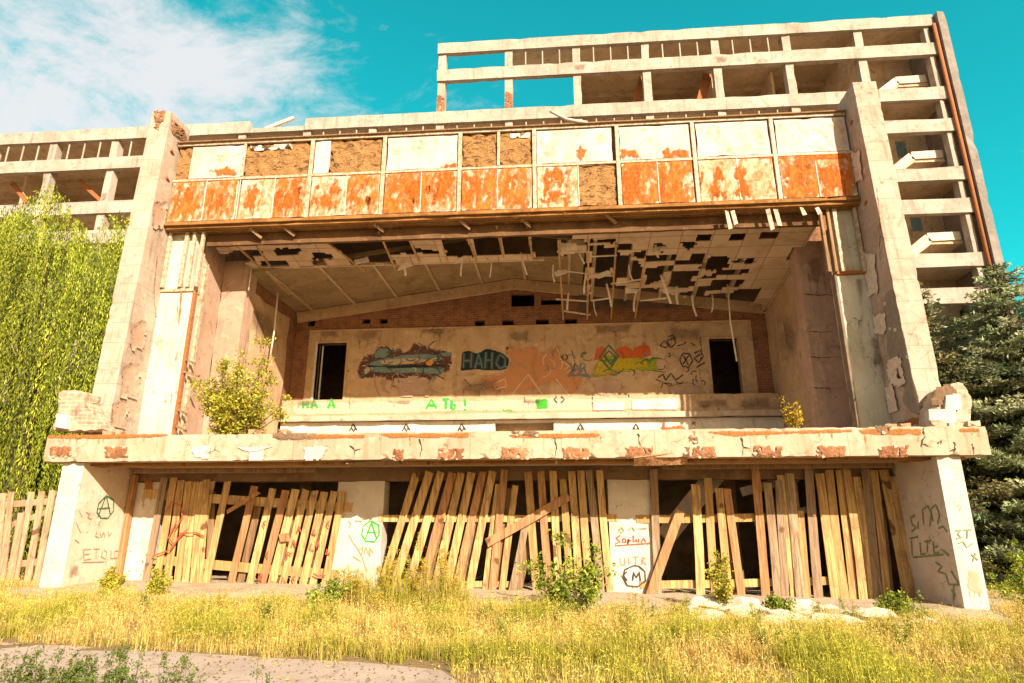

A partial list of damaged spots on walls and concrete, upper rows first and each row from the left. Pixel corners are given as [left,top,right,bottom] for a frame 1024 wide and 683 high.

spalling [154,110,188,141]
rust [168,145,587,221]
flaking render [864,252,957,457]
flaking render [110,320,147,429]
spalling [49,446,72,458]
spalling [104,446,128,459]
spalling [501,431,539,460]
spalling [562,447,589,460]
spalling [626,446,653,459]
spalling [684,436,716,459]
spalling [816,445,846,458]